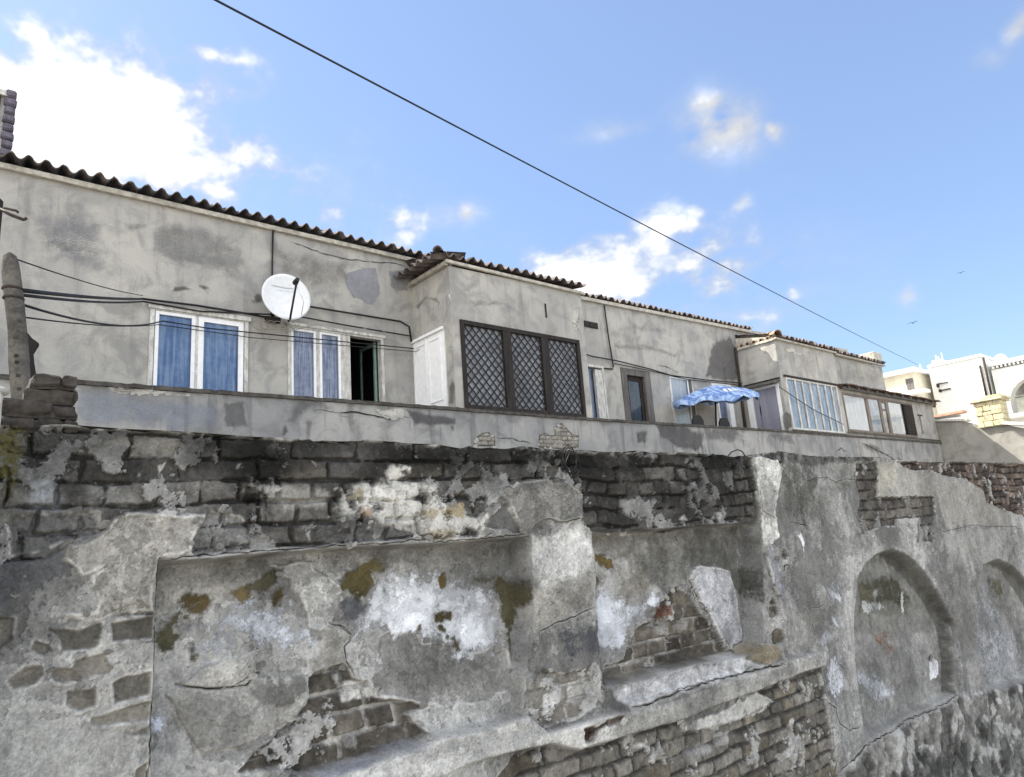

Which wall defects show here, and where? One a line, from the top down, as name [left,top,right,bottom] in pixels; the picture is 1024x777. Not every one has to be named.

crack [312,409,409,420]
flaking render [855,462,936,543]
flaking render [135,763,149,777]
water stain [190,593,316,663]
crack [140,518,581,774]
flaking render [0,423,790,735]
flaking render [238,565,742,776]
crack [635,580,782,707]
crack [820,668,954,773]